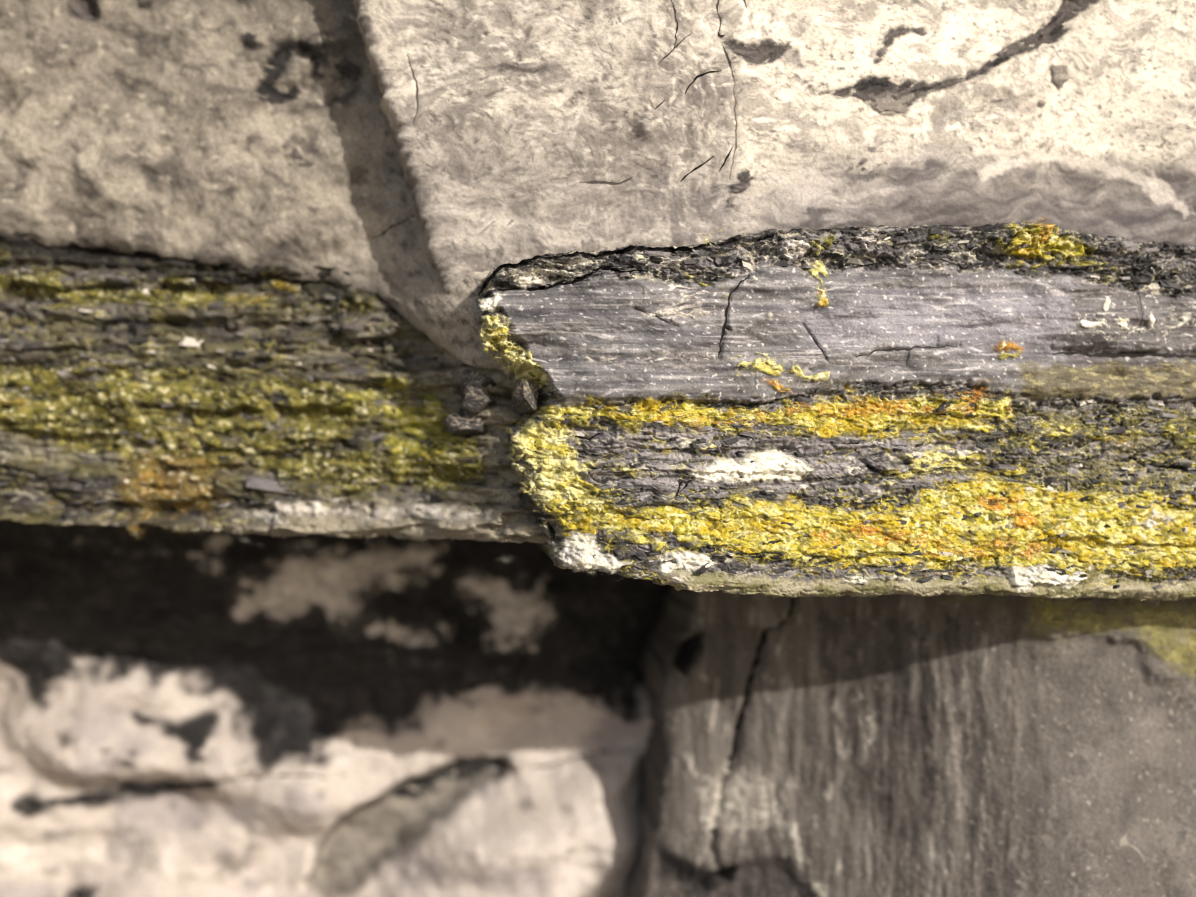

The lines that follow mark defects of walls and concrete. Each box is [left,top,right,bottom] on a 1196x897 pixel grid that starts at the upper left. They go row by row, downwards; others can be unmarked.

crack [655,0,747,182]
crack [710,598,794,869]